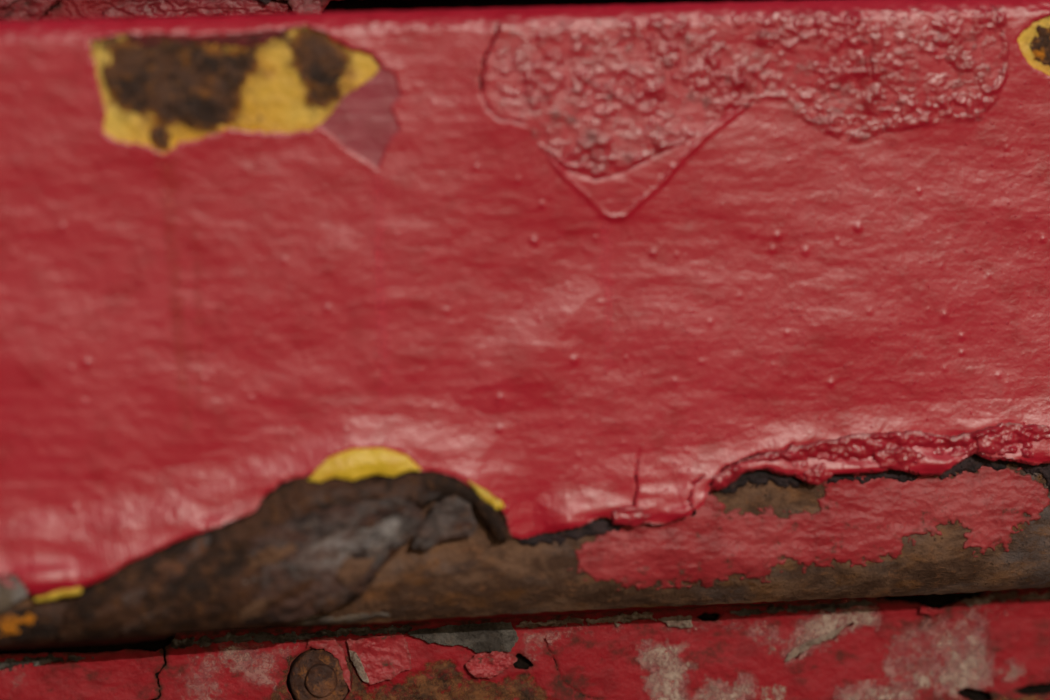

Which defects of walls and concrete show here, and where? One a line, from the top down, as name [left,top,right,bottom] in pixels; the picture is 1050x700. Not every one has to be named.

spalling [39,0,294,19]
peeling [90,26,401,168]
spalling [709,422,1050,491]
spalling [611,505,651,527]
corrosion [0,448,1050,649]
crack [151,639,169,700]
corrosion [345,657,548,700]
peeling [307,611,693,693]
damp [639,640,785,700]
damp [769,600,879,663]
damp [835,629,1026,700]